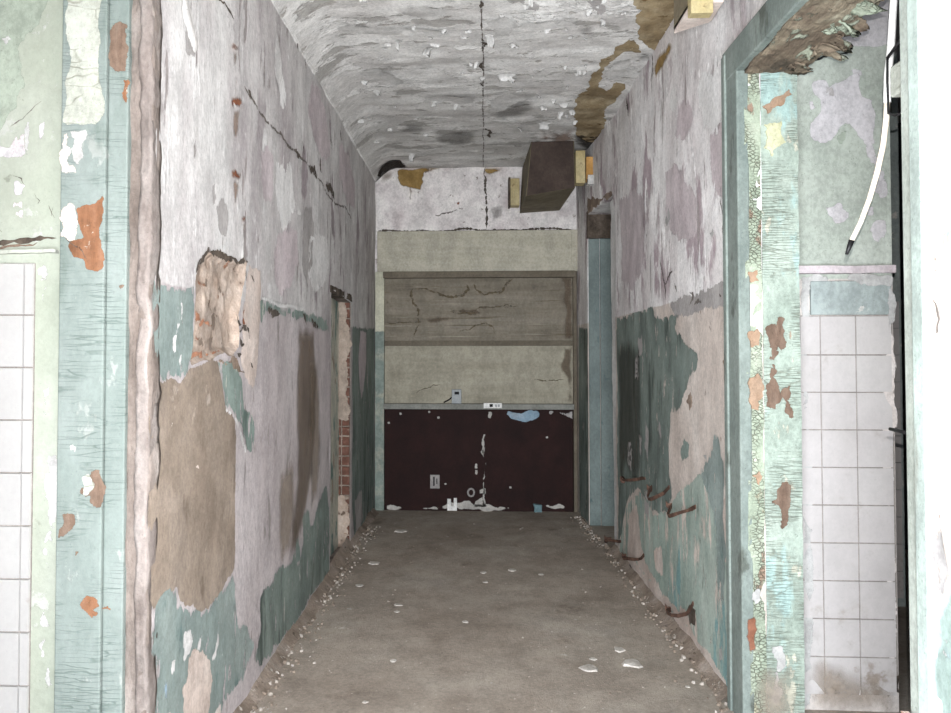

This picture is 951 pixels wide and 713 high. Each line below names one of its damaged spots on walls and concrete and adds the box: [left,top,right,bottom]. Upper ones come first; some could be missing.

crack [0,176,59,255]
crack [244,86,351,218]
crack [379,1,572,231]
damp [576,135,597,150]
peeling [784,0,889,242]
flaking render [59,0,375,713]
crack [387,279,516,335]
peeling [747,317,809,418]
flaking render [848,273,898,433]
peeling [423,501,505,511]
peeling [616,281,727,685]
flaking render [772,482,814,601]